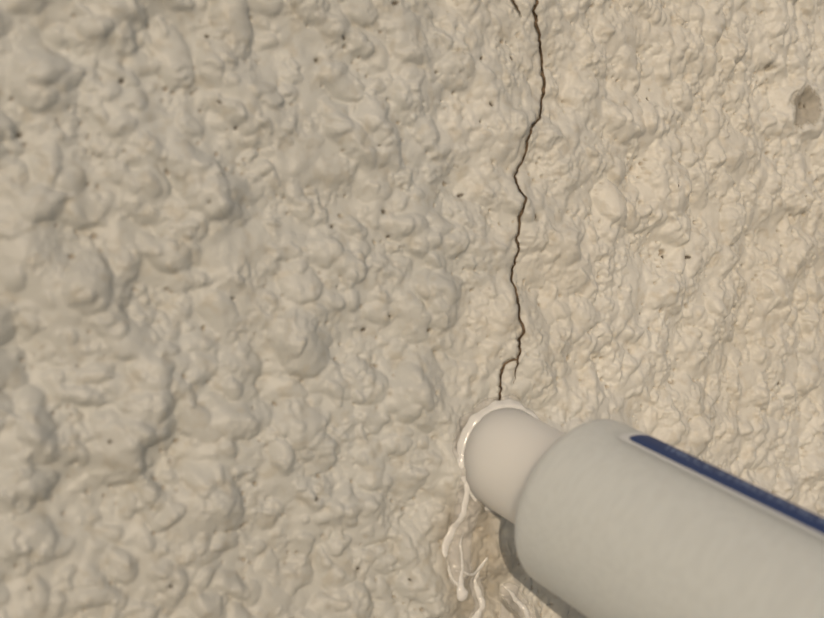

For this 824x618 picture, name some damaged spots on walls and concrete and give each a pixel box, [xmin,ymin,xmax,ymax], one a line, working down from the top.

crack [498,0,546,400]